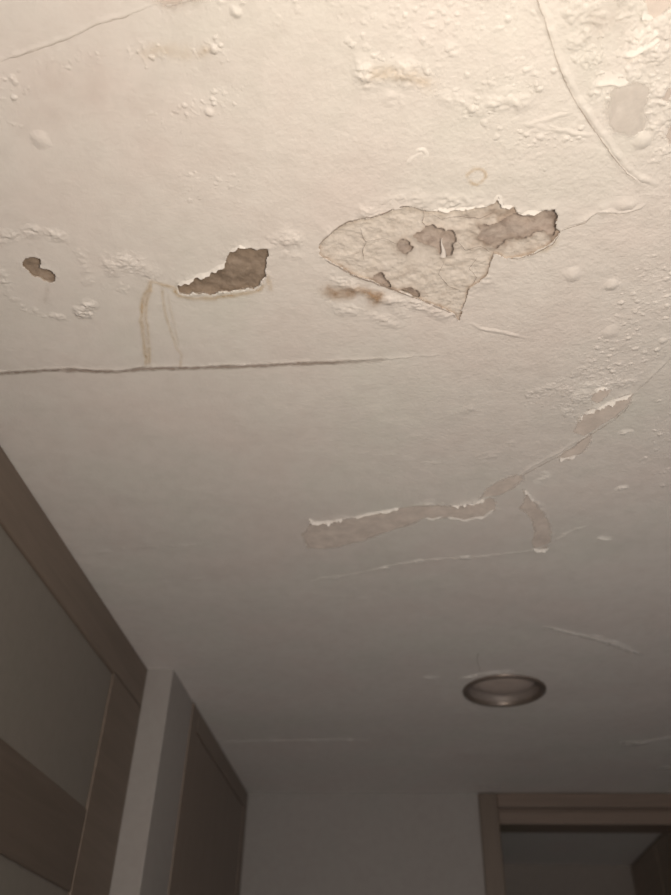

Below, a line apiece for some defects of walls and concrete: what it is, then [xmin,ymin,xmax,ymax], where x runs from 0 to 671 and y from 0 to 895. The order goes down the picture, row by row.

crack [0,0,192,62]
peeling [557,0,671,178]
peeling [15,252,63,286]
peeling [169,237,279,302]
spalling [311,191,568,324]
crack [0,351,445,374]
peeling [555,387,640,462]
peeling [302,494,501,549]